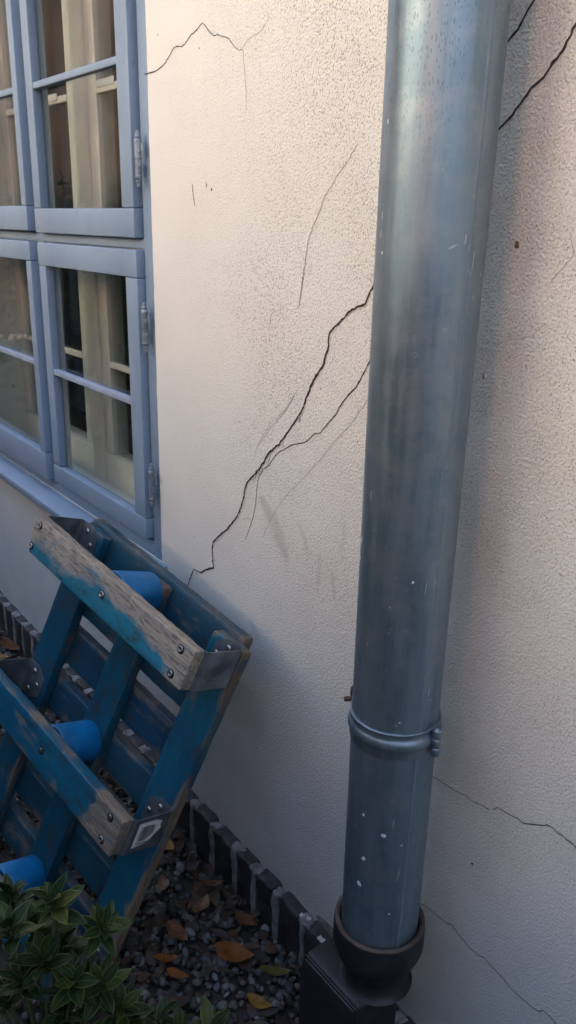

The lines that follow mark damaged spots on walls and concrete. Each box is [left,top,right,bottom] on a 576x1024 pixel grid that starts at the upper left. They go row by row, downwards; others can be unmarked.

crack [144,18,269,88]
crack [507,0,535,43]
crack [498,22,576,132]
crack [187,269,374,586]
crack [433,776,576,848]